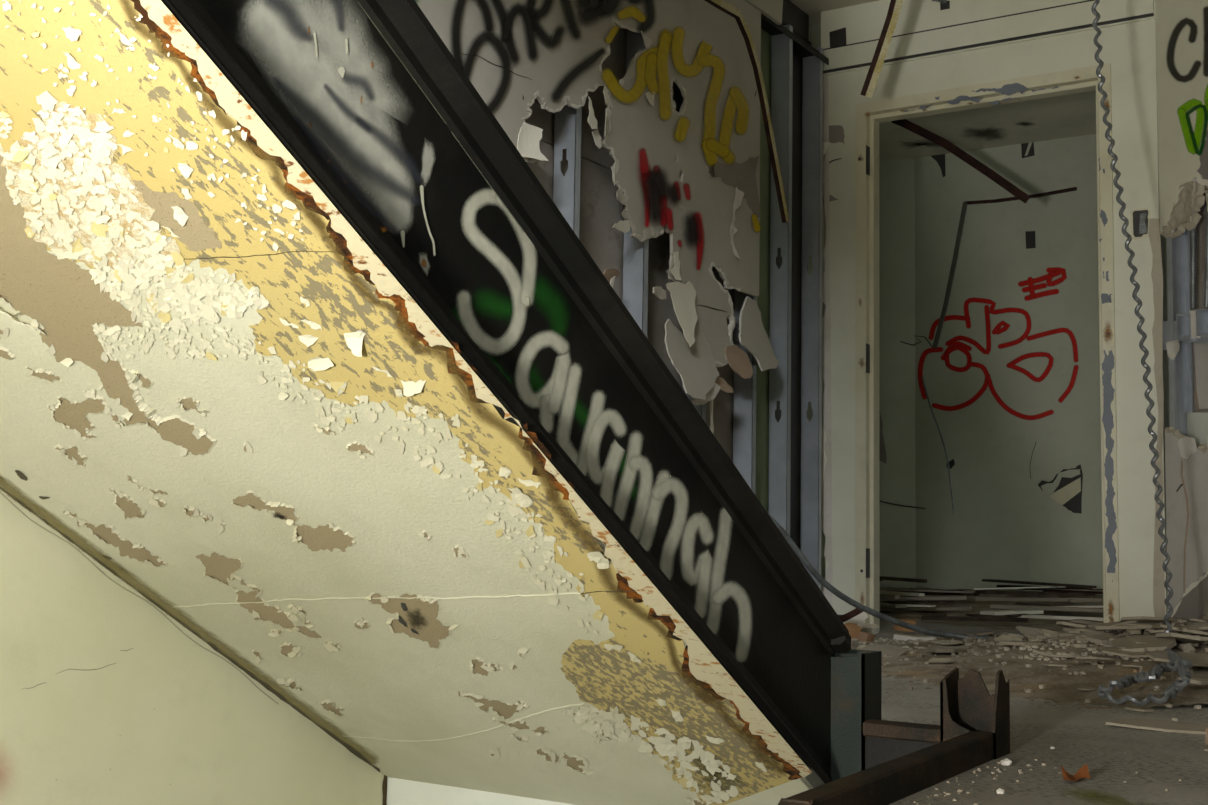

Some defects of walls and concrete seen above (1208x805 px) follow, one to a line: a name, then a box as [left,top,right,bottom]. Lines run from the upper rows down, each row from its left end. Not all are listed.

peeling [0,0,792,805]
peeling [1148,130,1208,623]